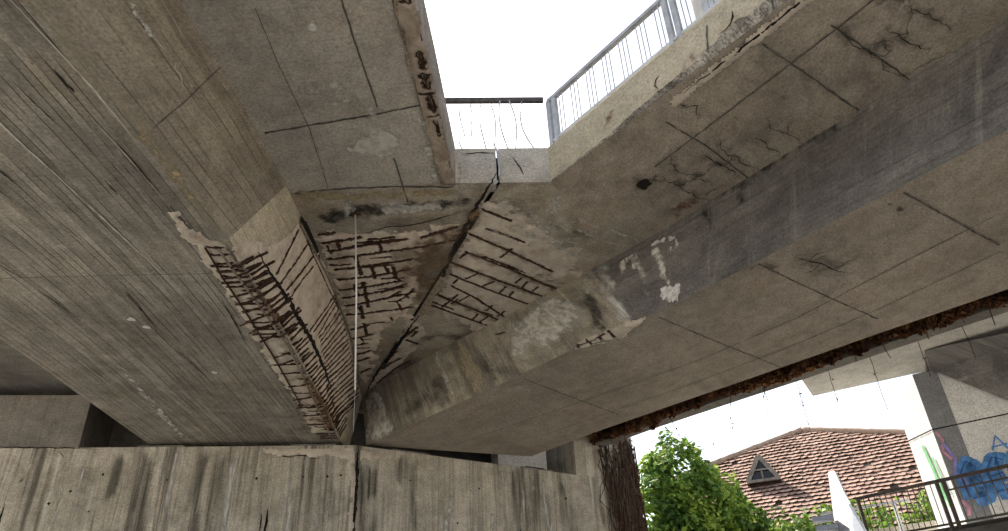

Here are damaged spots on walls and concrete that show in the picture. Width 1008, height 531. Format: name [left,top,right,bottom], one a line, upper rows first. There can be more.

spalling [396,0,456,184]
spalling [551,0,813,181]
crack [359,209,469,234]
leakage [494,196,645,277]
leakage [651,236,680,302]
spalling [168,199,582,531]
leakage [511,275,630,357]
spalling [575,317,646,350]